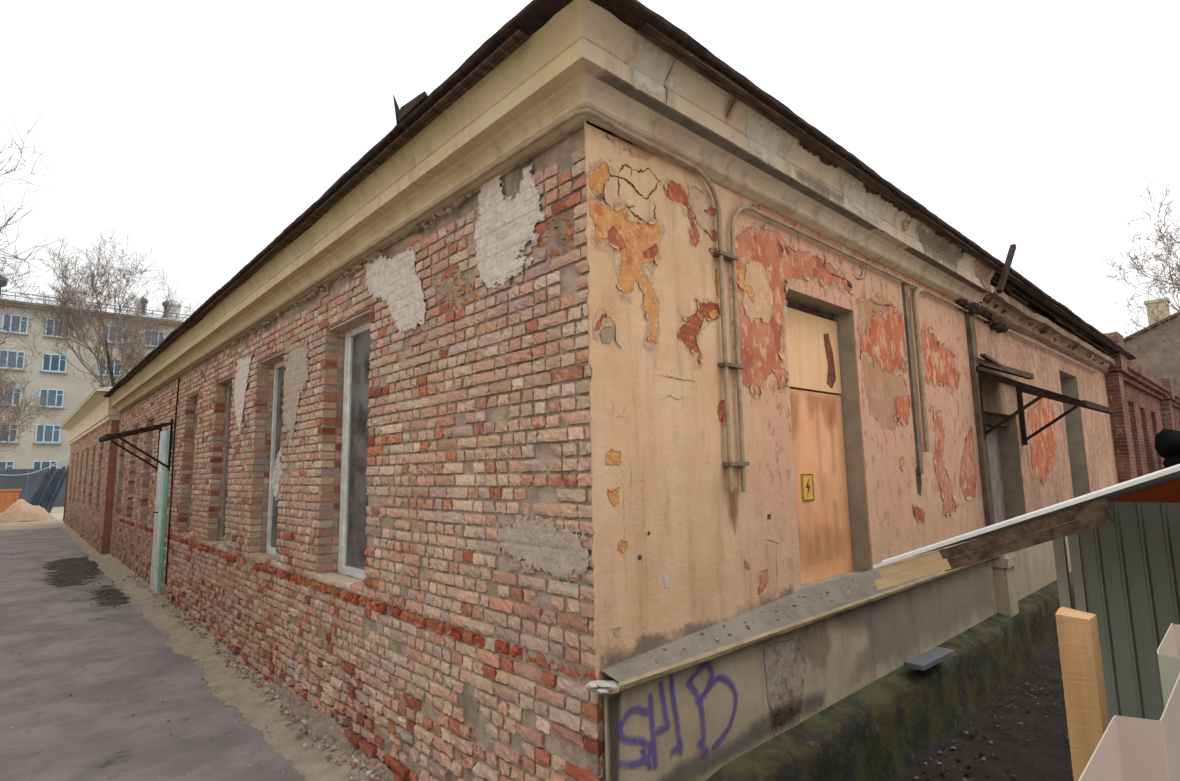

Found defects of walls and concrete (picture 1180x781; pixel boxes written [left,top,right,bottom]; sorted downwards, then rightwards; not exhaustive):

crack [603,131,660,223]
flaking render [534,210,574,258]
peeling [586,159,666,351]
peeling [662,180,960,431]
peeling [607,487,620,507]
peeling [606,449,623,466]
peeling [932,406,978,516]
peeling [1027,398,1057,485]